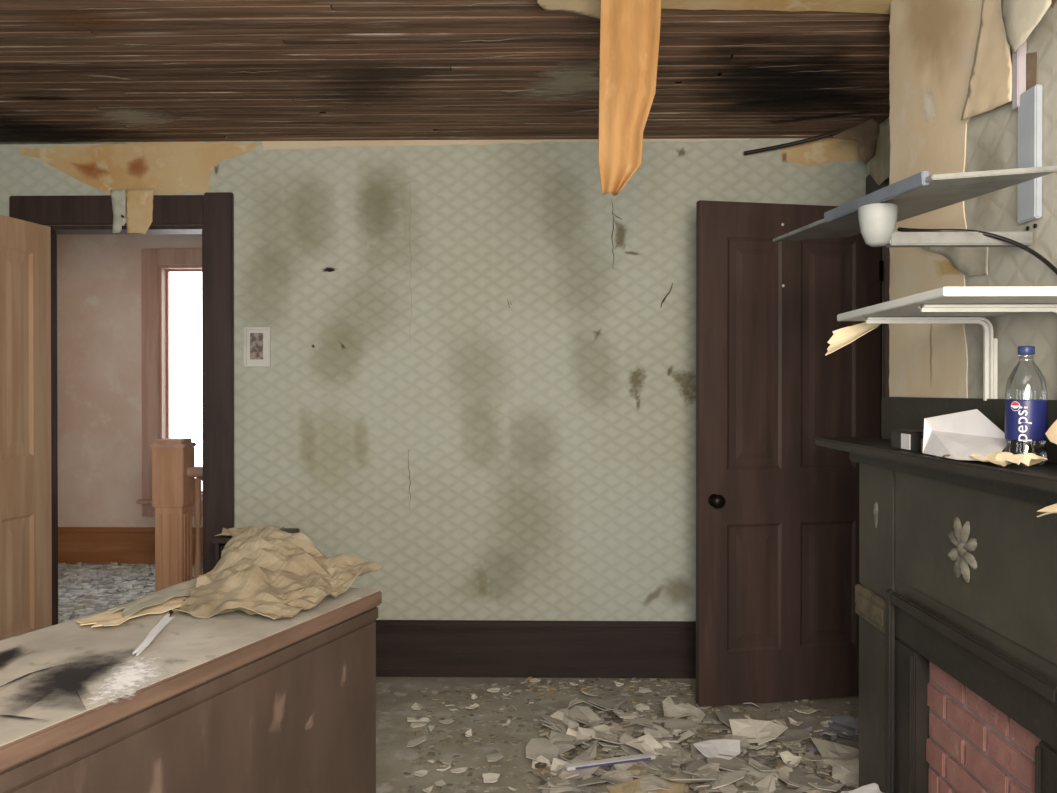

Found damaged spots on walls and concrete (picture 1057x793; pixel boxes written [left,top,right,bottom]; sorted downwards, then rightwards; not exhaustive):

peeling [19,0,749,234]
leakage [706,39,874,123]
peeling [781,0,1057,185]
leakage [616,228,637,255]
peeling [895,201,967,232]
peeling [889,247,989,301]
leakage [631,370,643,406]
peeling [889,324,968,398]